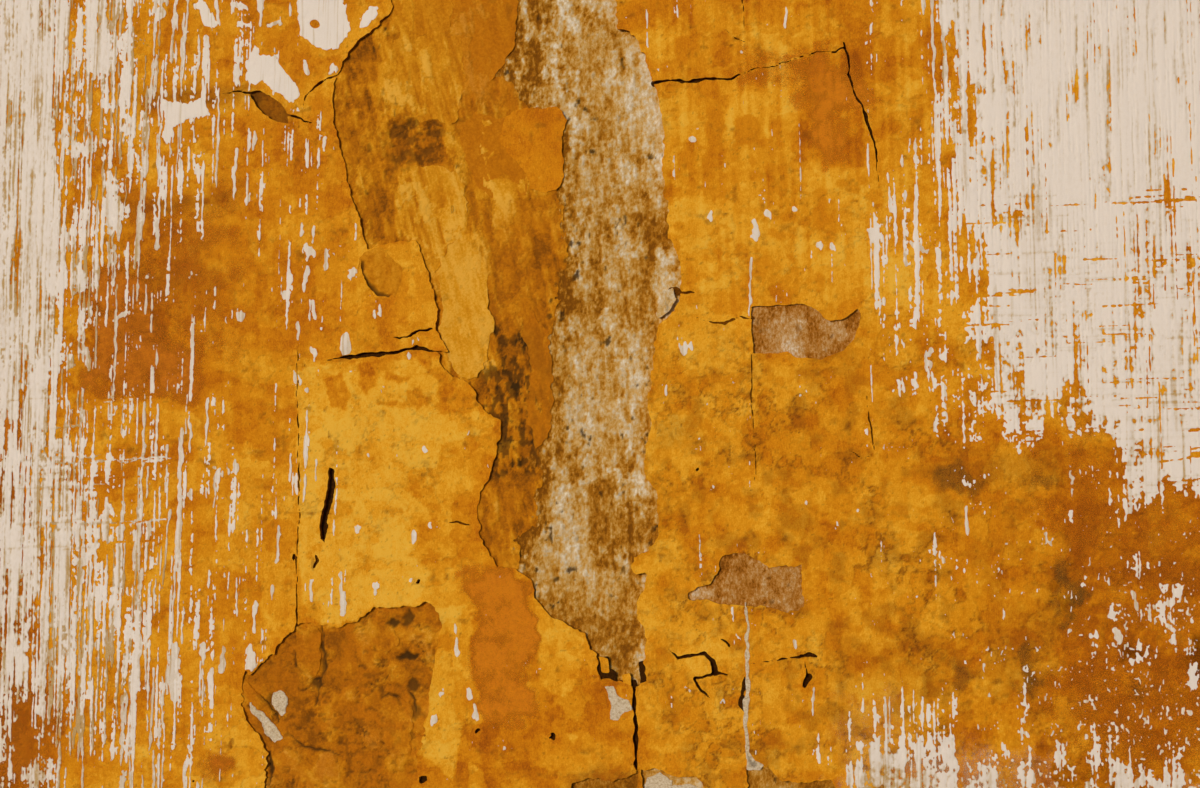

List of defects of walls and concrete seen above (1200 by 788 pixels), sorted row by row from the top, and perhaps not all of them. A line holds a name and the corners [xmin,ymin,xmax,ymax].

crack [651,69,754,87]
crack [800,43,879,182]
peeling [0,0,442,788]
crack [295,355,336,569]
crack [328,328,436,361]
flaking render [332,0,681,720]
flaking render [751,304,861,360]
peeling [886,0,1200,651]
flaking render [688,553,804,612]
crack [672,602,817,770]
peeling [747,681,1200,788]